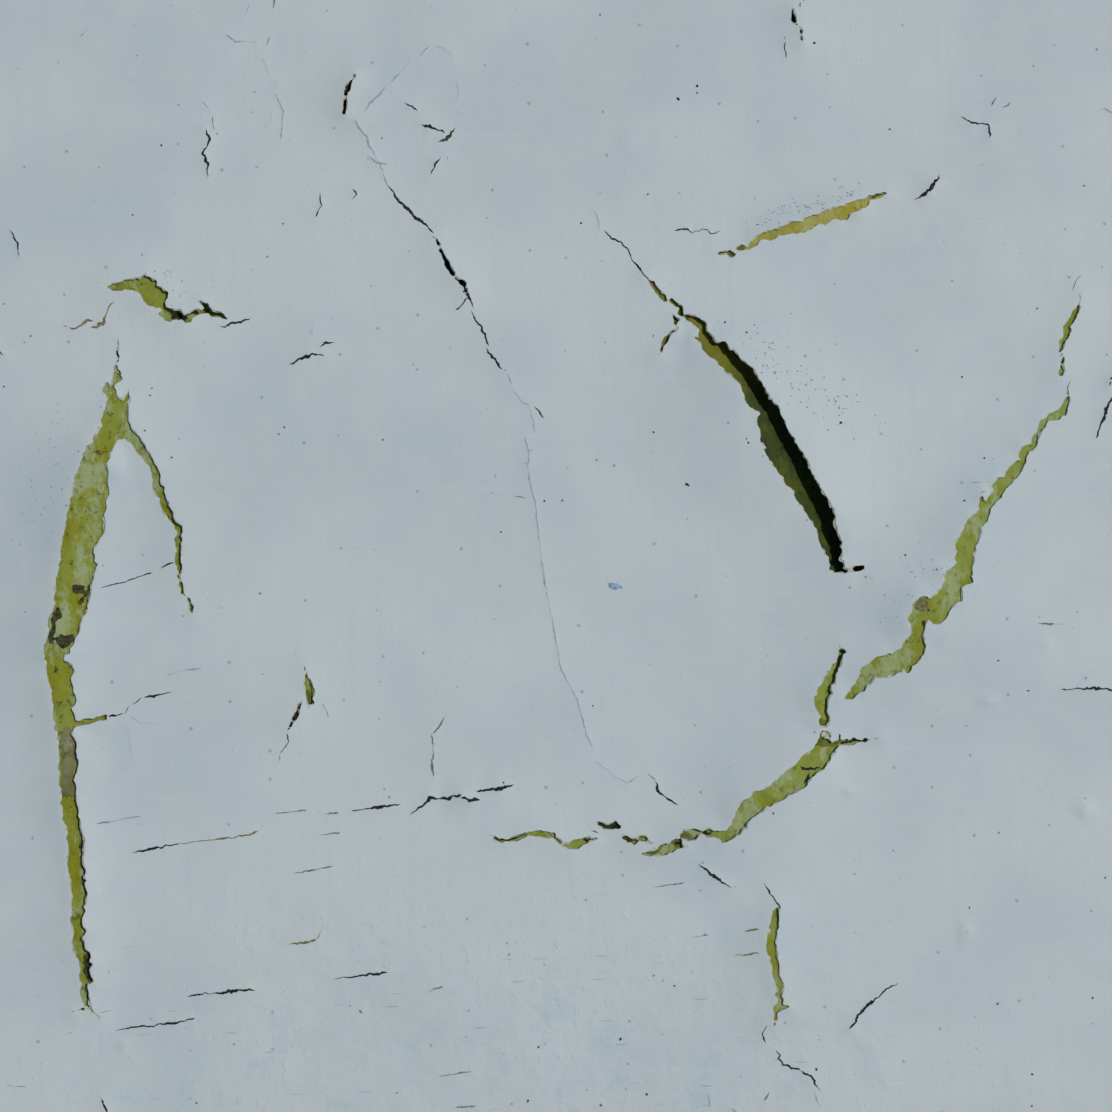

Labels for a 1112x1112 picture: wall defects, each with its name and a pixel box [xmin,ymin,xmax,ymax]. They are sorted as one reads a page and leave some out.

crack [784,0,804,56]
crack [289,341,334,365]
crack [1096,377,1112,438]
crack [342,46,1081,888]
crack [44,273,256,1031]
crack [279,666,328,759]
crack [1061,684,1112,692]
crack [133,717,513,853]
crack [288,932,321,945]
crack [337,971,443,994]
crack [738,883,820,1104]
crack [849,983,898,1029]